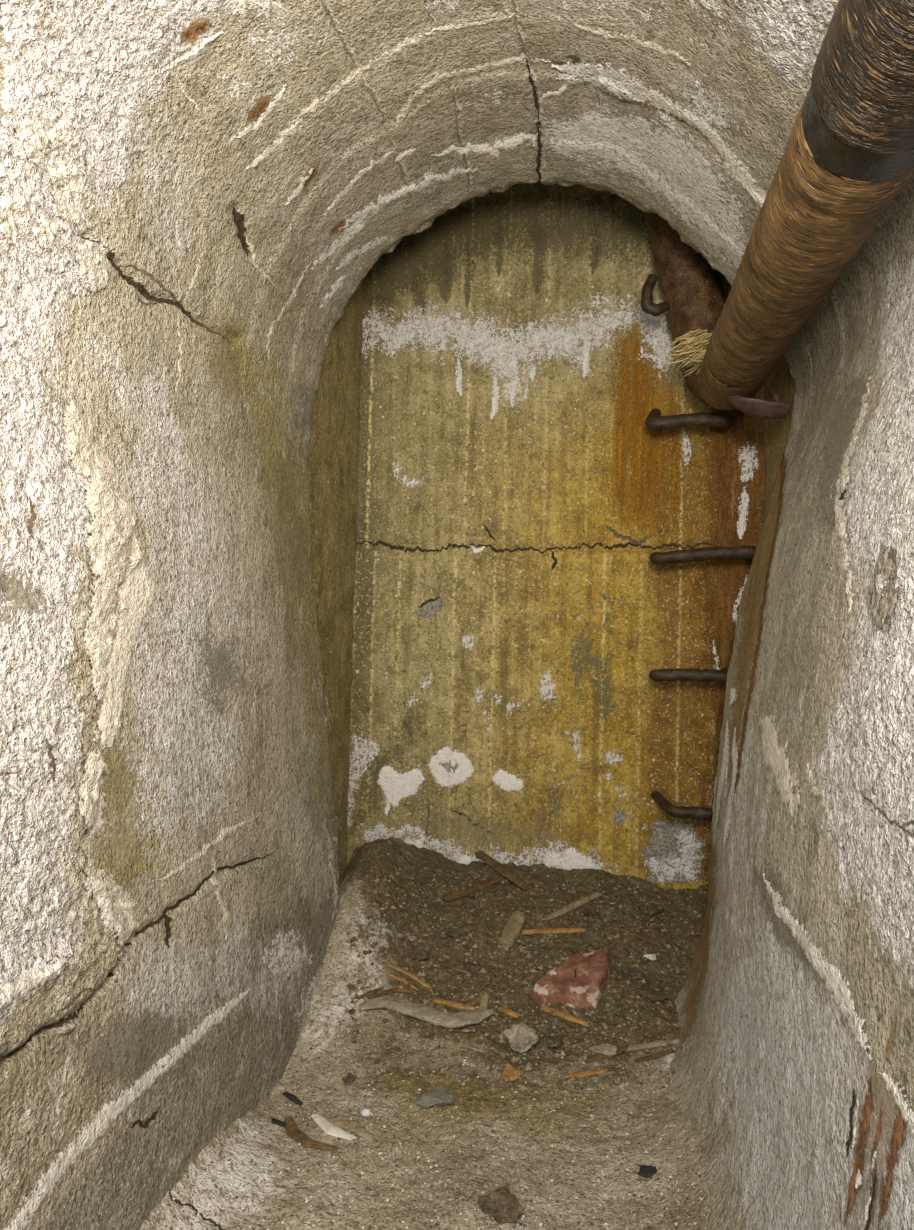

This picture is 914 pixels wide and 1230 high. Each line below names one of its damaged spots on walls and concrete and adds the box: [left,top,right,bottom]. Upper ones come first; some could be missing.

flaking render [0,63,112,295]
crack [82,237,232,343]
crack [511,0,548,182]
damp [311,55,766,419]
corrosion [595,322,687,549]
crack [357,523,739,571]
corrosion [680,407,788,1042]
crack [0,852,273,1062]
crack [130,1110,158,1128]
corrosion [844,1008,905,1230]